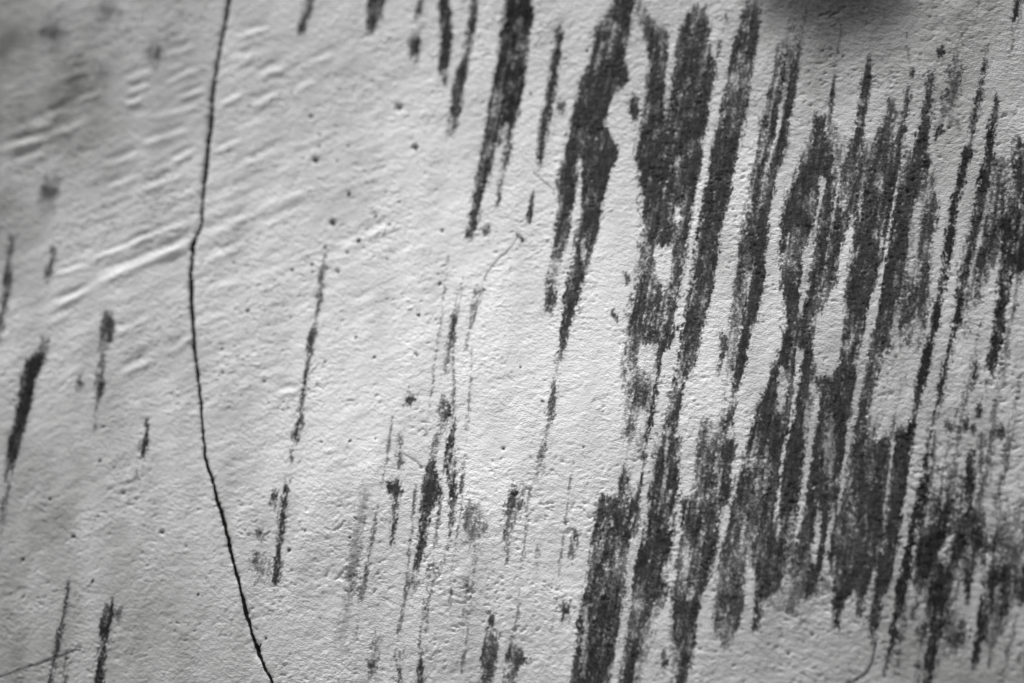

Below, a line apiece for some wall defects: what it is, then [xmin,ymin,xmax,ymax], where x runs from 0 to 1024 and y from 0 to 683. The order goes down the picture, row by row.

crack [189,0,273,683]